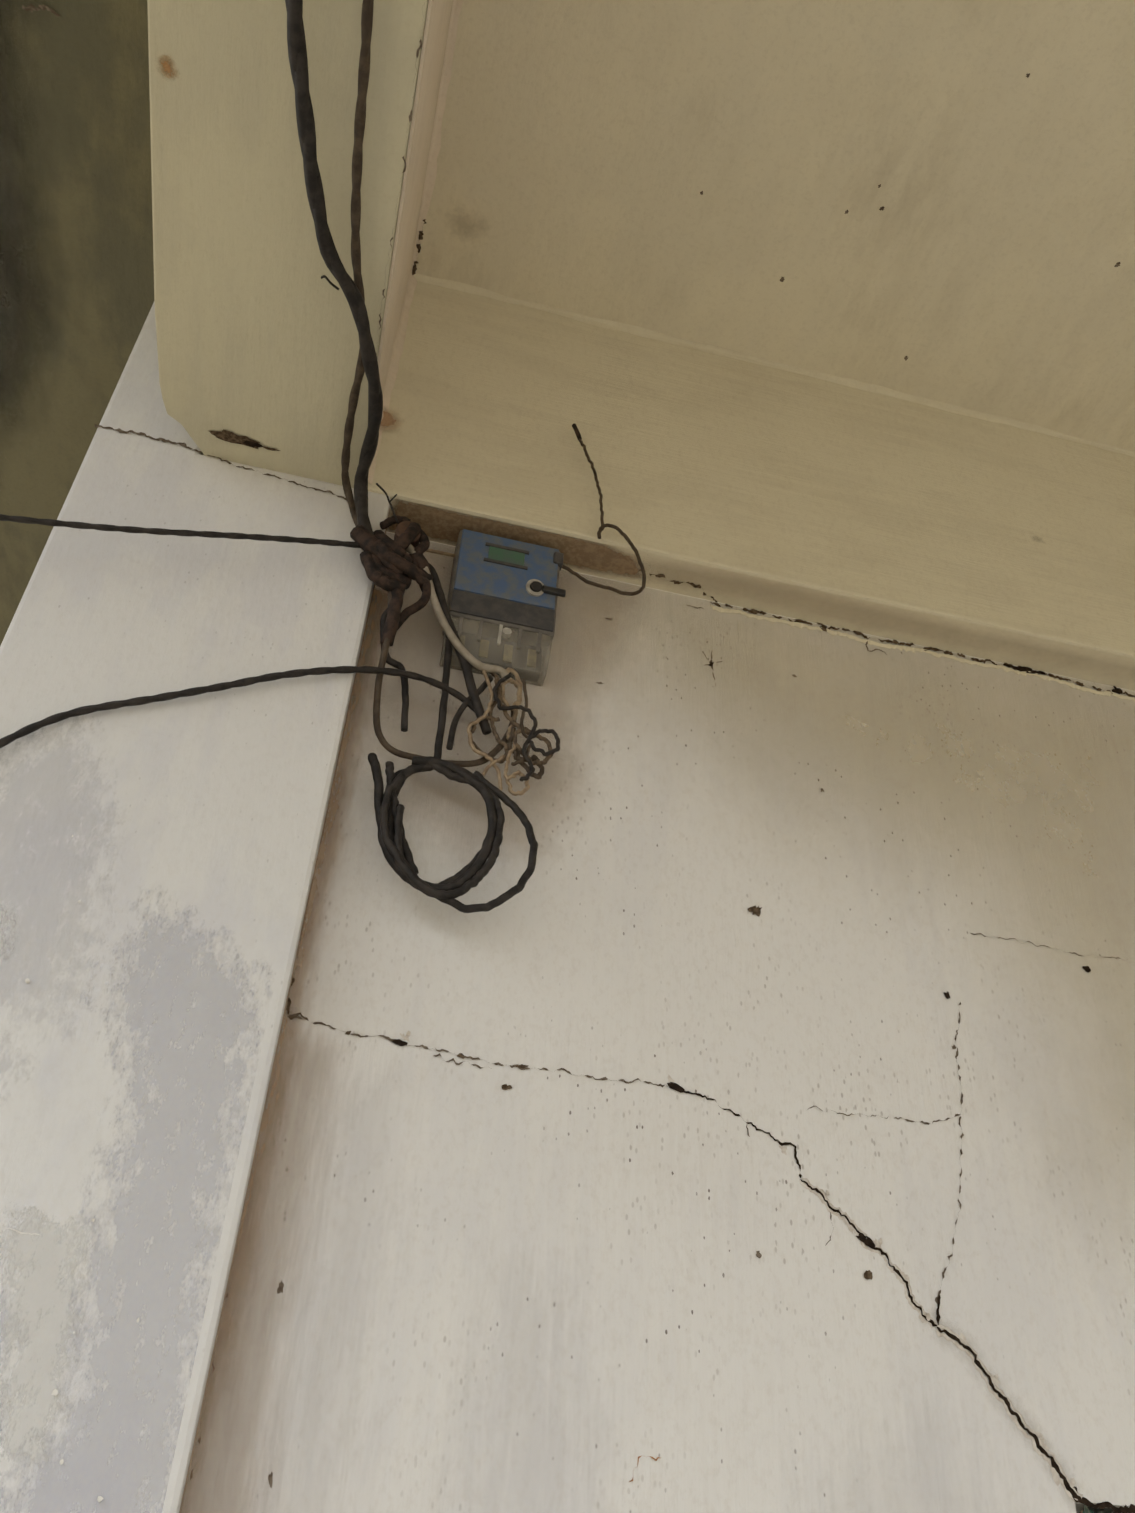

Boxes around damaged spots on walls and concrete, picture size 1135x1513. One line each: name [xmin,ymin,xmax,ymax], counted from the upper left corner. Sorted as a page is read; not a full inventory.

crack [639,569,1135,701]
crack [286,918,1083,1502]